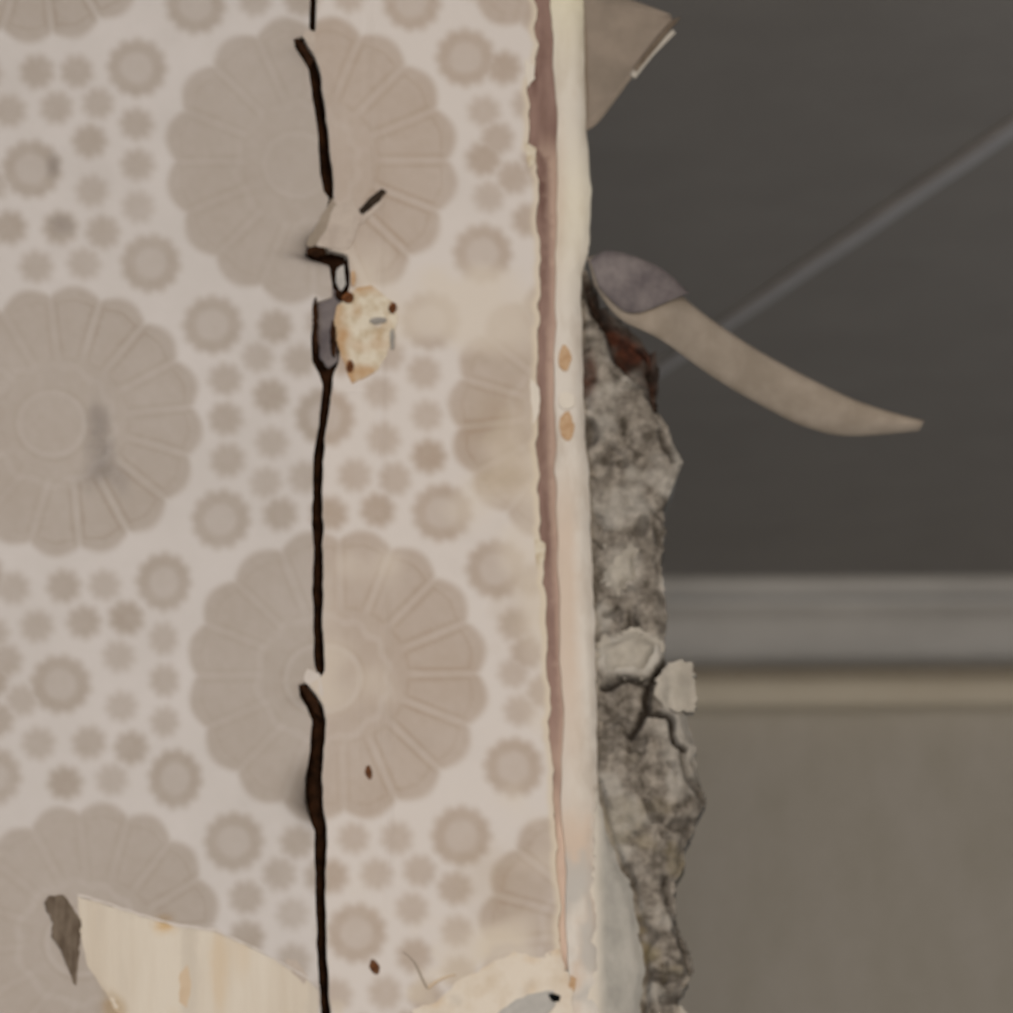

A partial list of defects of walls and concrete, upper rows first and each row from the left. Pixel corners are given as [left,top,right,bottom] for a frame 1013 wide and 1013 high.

crack [293,0,333,205]
spalling [306,199,361,258]
spalling [312,265,397,384]
crack [359,189,386,225]
spalling [524,0,706,1013]
crack [299,244,349,1013]